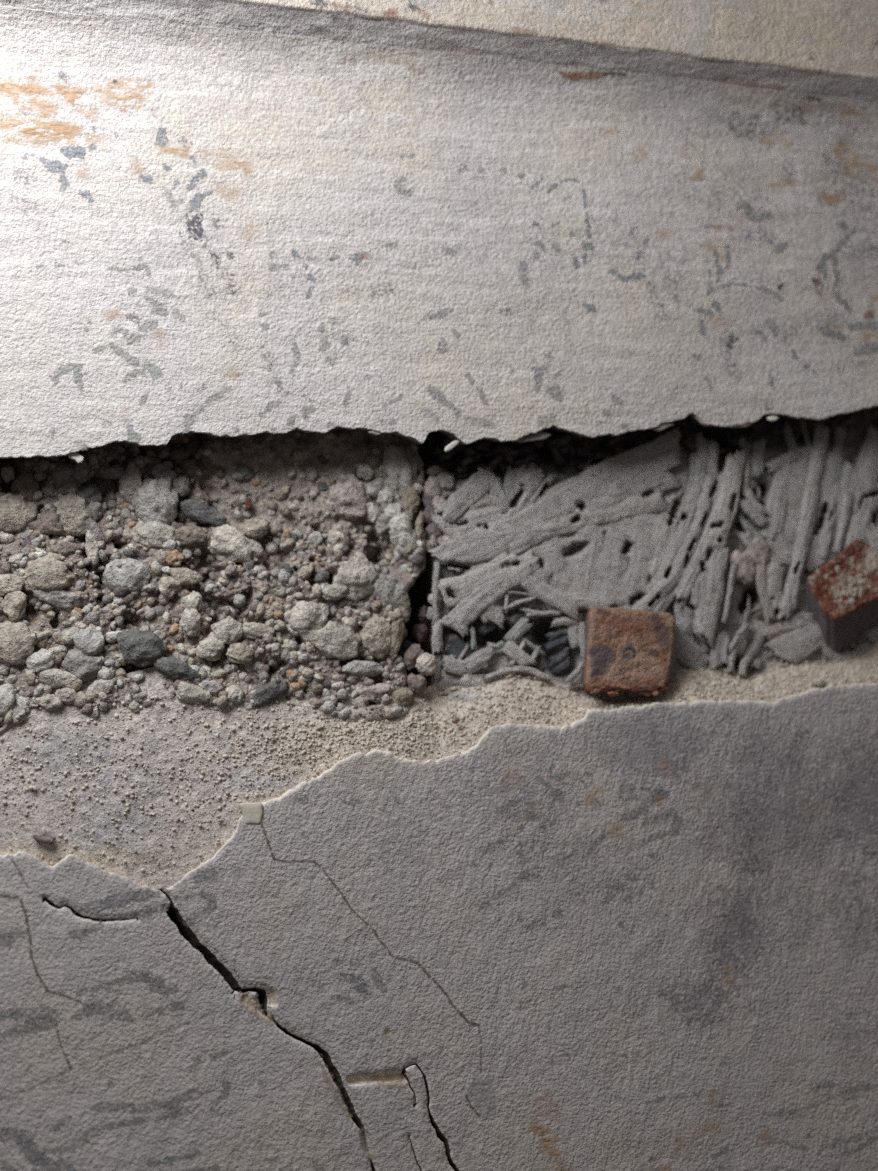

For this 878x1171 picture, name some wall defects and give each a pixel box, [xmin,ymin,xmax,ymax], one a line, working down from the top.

peeling [261,341,301,393]
peeling [318,323,362,366]
peeling [465,372,488,405]
corrosion [824,557,872,604]
spalling [0,383,878,939]
corrosion [584,683,665,697]
crack [261,816,479,1026]
crack [0,859,379,1171]
crack [400,1060,463,1171]